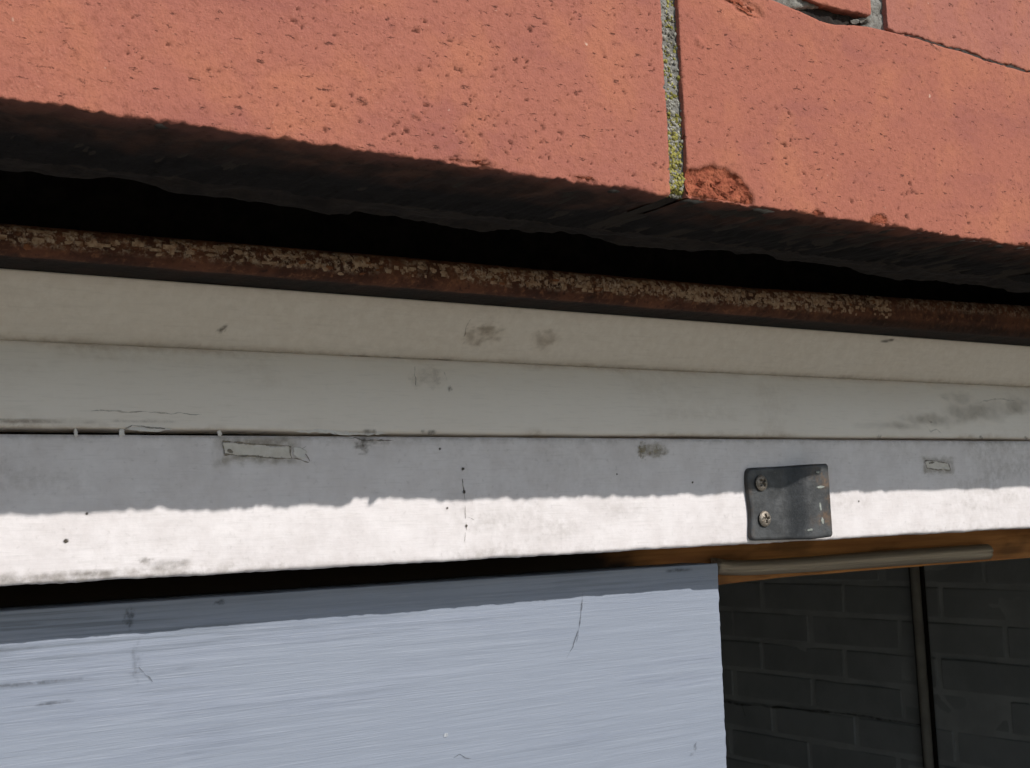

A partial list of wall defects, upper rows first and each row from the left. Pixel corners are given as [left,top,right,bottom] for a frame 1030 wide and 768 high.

crack [892,31,1026,72]
spalling [684,166,753,206]
peeling [217,429,310,463]
crack [725,701,920,725]